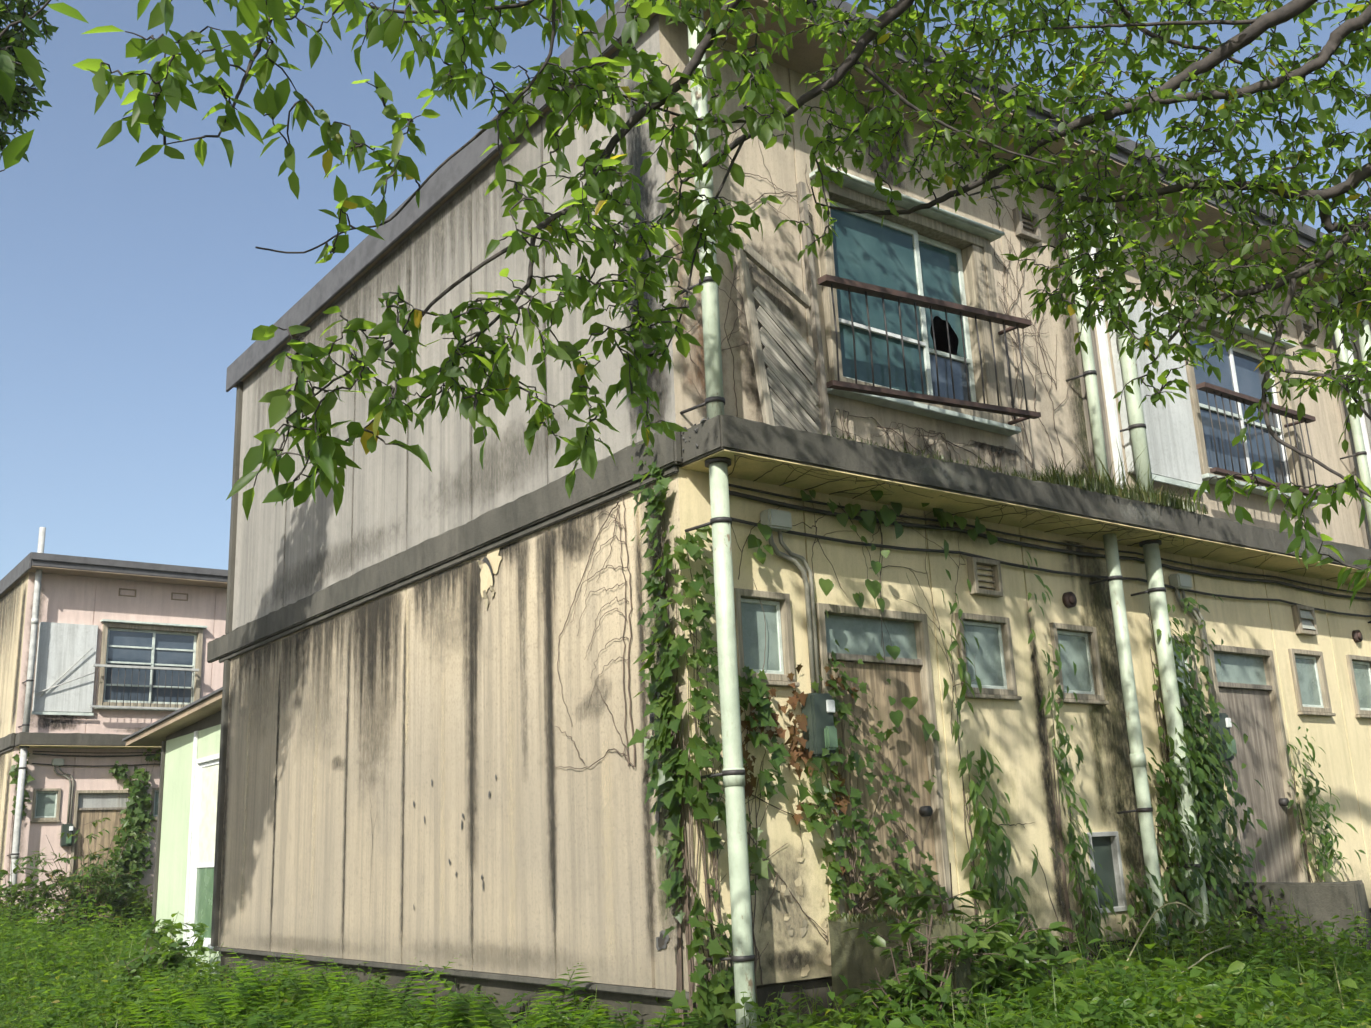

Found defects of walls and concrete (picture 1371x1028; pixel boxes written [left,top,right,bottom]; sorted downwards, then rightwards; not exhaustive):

water stain [220,560,481,932]
water stain [499,505,606,926]
water stain [1029,622,1079,927]
water stain [1064,541,1147,904]